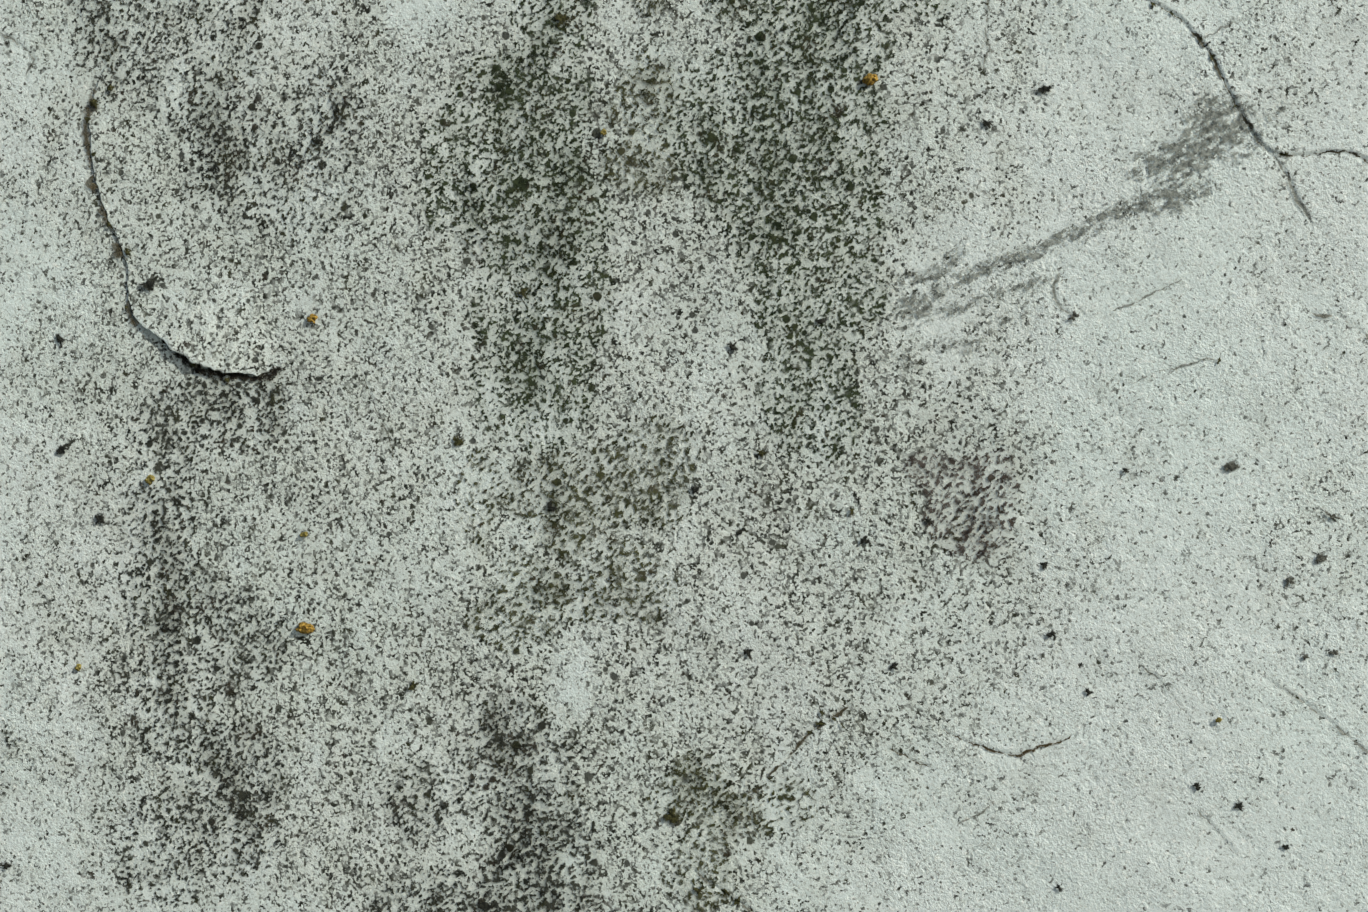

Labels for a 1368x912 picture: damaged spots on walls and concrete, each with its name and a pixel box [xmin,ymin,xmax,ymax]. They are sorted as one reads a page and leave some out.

mould [72,0,369,242]
crack [1151,1,1368,220]
leakage [139,279,156,291]
mould [420,0,958,654]
crack [1049,270,1071,362]
crack [1113,279,1182,311]
mould [902,450,1019,559]
mould [117,373,293,905]
mould [367,694,604,912]
mould [644,750,815,912]